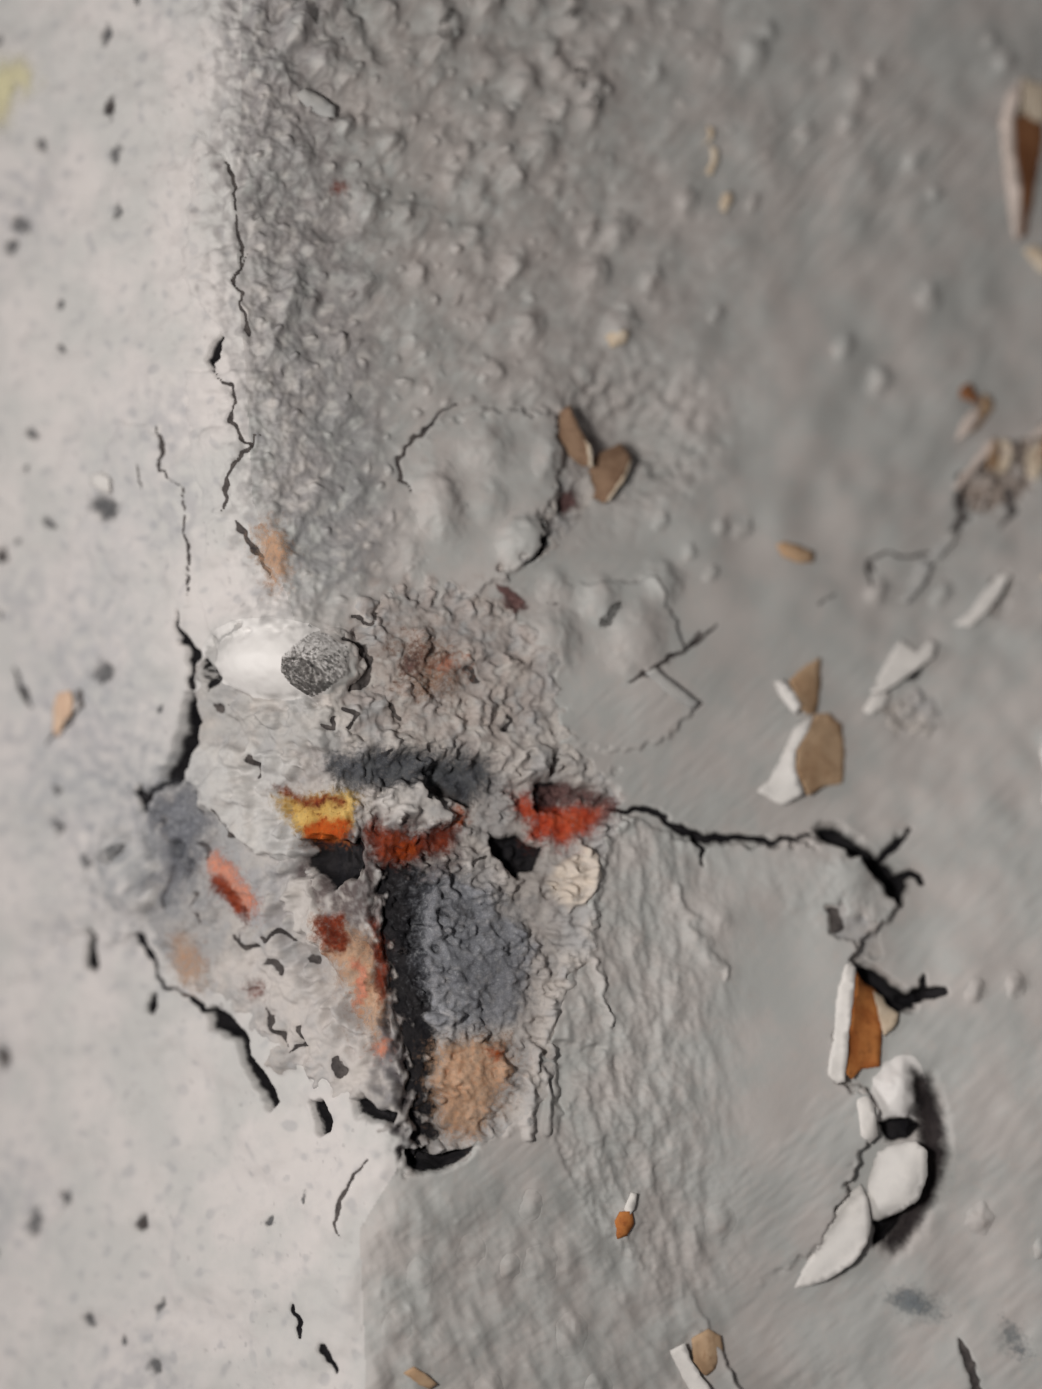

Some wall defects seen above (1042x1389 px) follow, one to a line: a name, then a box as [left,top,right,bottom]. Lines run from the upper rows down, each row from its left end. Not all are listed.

crack [217,378,272,577]
crack [136,426,222,794]
peeling [758,657,845,805]
rust [277,788,464,866]
spalling [140,579,623,1162]
rust [515,782,616,843]
crack [610,806,924,905]
crack [136,933,280,1107]
rust [313,915,388,1057]
crack [855,967,948,1012]
peeling [794,901,928,1288]
peeling [670,1329,723,1389]